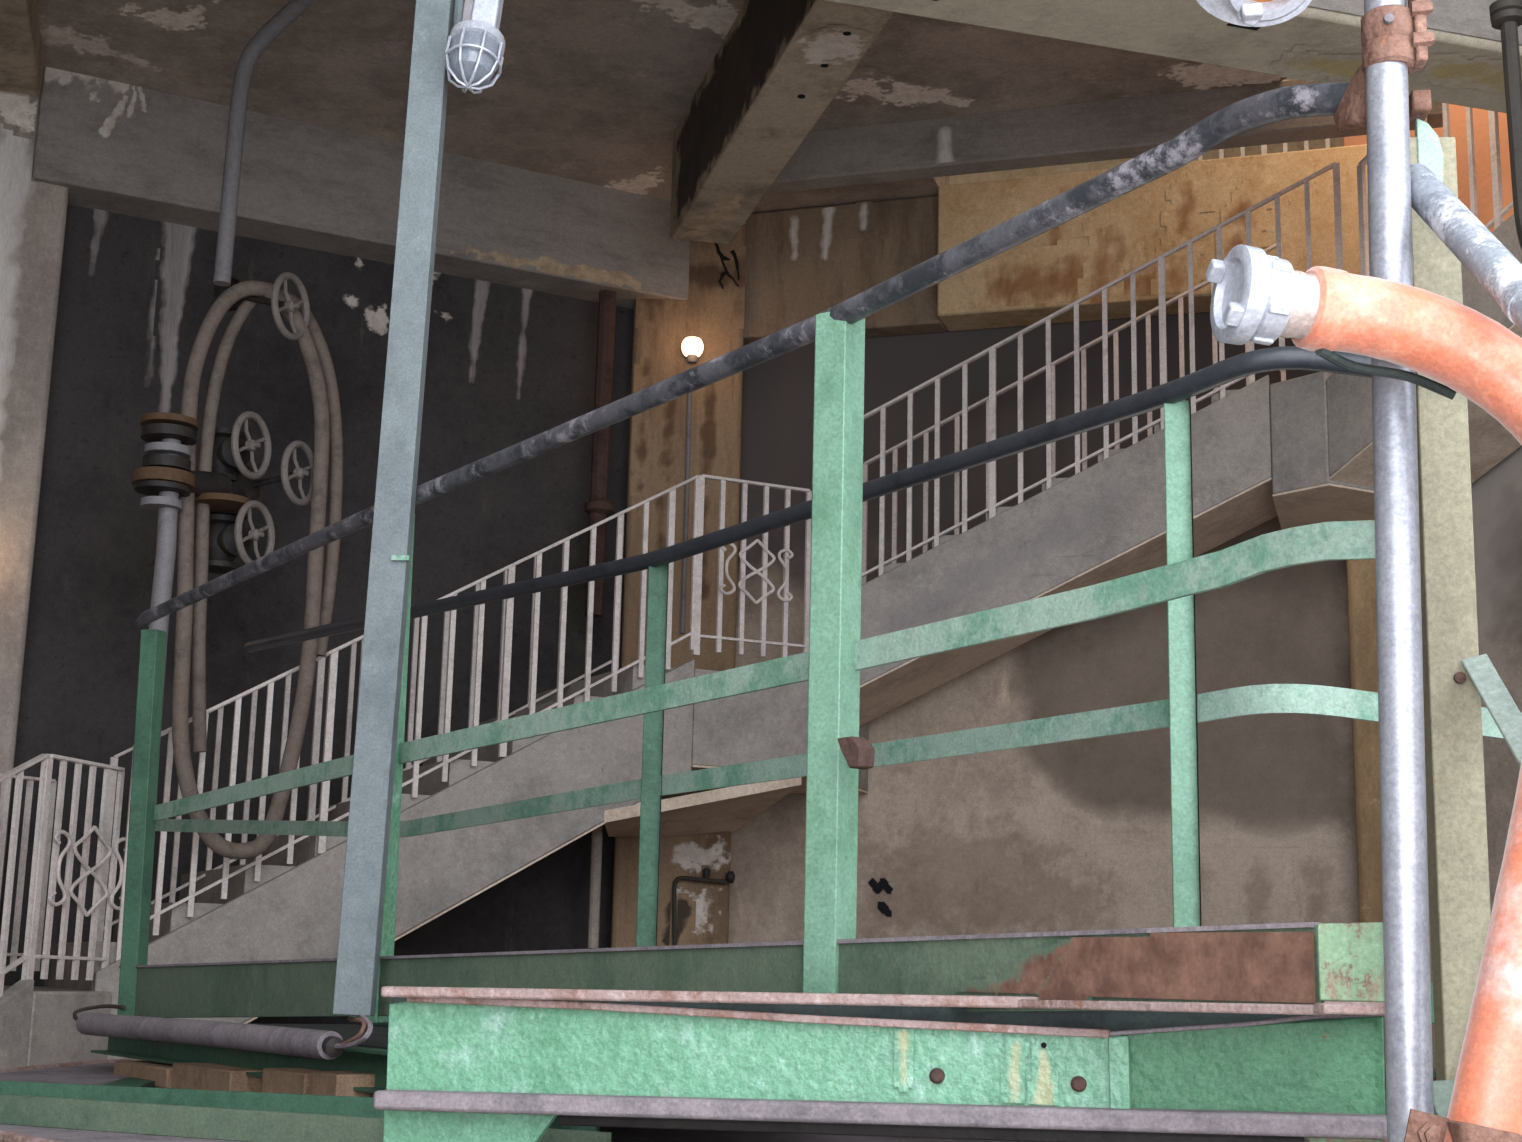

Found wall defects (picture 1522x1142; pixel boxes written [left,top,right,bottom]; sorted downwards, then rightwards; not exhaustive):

peeling [94,0,217,35]
peeling [832,67,981,109]
damp [0,13,171,545]
efflorescence [138,221,201,413]
efflorescence [464,279,492,386]
efflorescence [512,287,537,405]
corrosion [962,171,1274,309]
spalling [661,833,731,942]
corrosion [950,932,1316,1003]